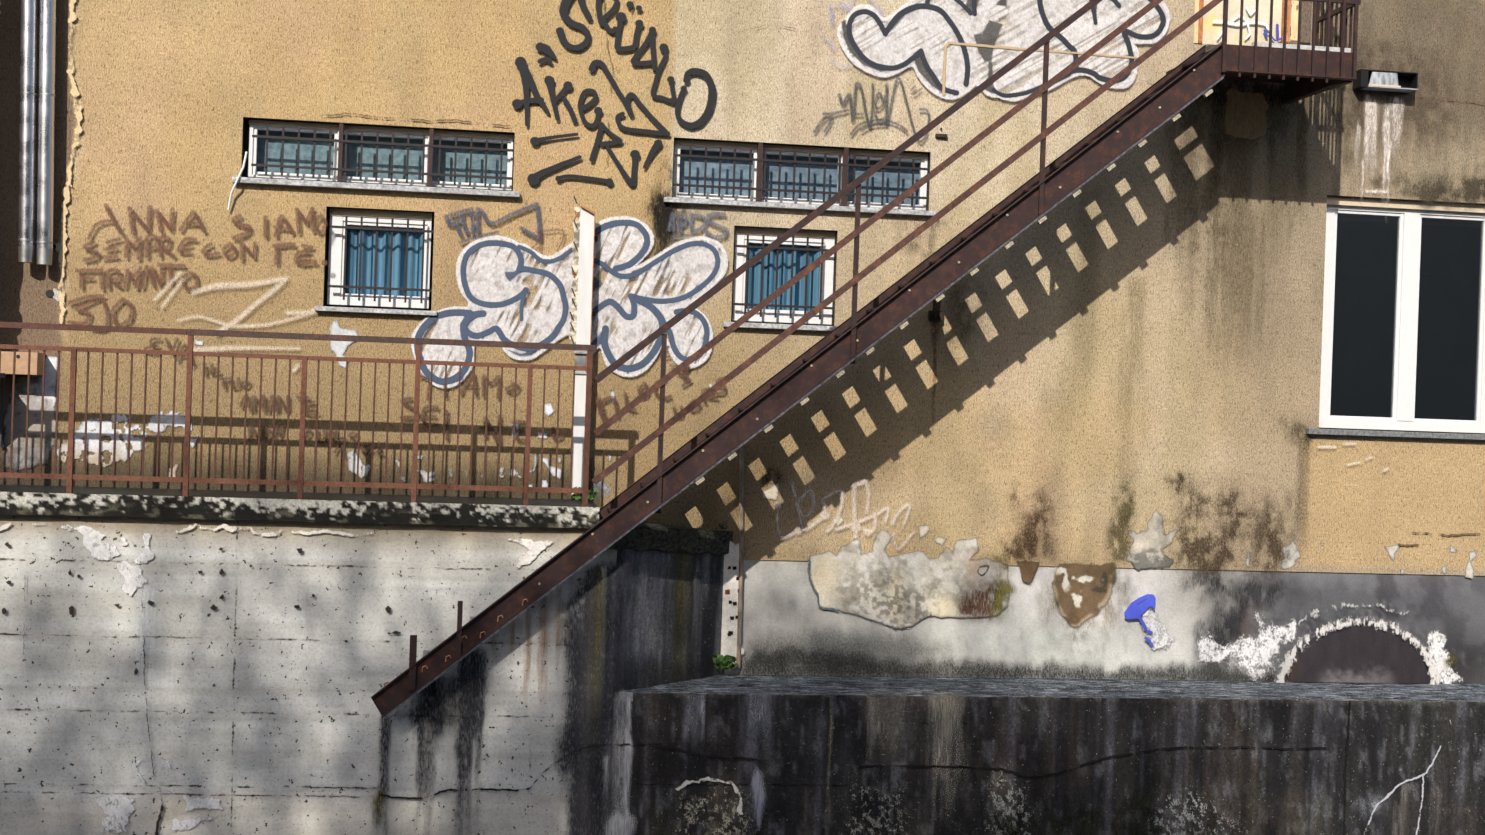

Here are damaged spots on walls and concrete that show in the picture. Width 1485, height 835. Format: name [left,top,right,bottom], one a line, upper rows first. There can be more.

damp [1357,96,1485,204]
spalling [809,525,1010,629]
damp [1109,487,1133,568]
peeling [1126,510,1177,570]
damp [1170,473,1463,685]
peeling [1385,545,1404,574]
peeling [1441,545,1477,579]
damp [376,717,391,823]
damp [409,649,486,816]
damp [556,549,633,835]
crack [858,746,1330,779]
crack [1368,746,1441,835]